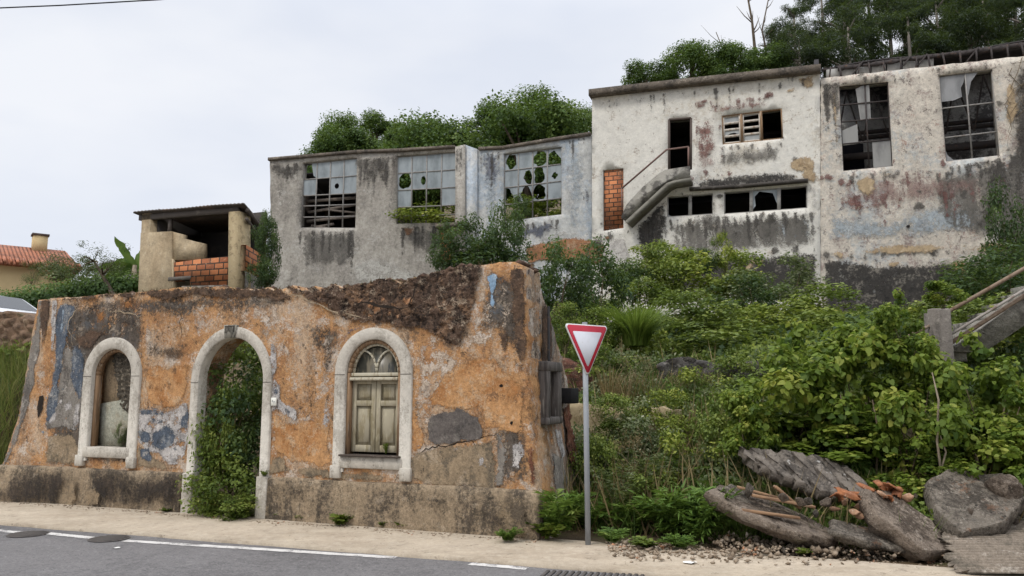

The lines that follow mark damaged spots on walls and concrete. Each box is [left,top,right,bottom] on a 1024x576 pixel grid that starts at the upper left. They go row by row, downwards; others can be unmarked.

spalling [791,156,816,182]
water stain [936,69,1024,267]
water stain [298,230,354,273]
water stain [400,226,448,253]
water stain [628,137,986,313]
spalling [1,157,629,505]
crack [417,433,497,454]
water stain [0,473,65,503]
water stain [90,474,174,505]